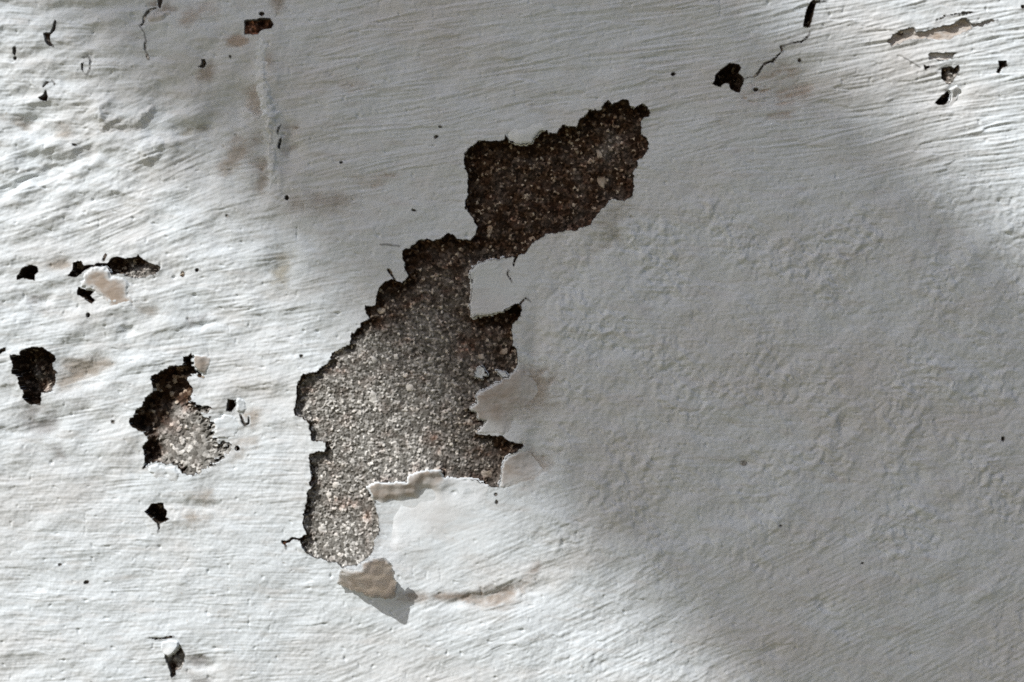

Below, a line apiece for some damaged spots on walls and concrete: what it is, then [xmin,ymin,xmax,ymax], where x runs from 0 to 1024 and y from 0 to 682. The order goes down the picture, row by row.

spalling [245,13,273,34]
crack [742,1,820,80]
peeling [887,12,994,46]
spalling [713,66,742,92]
spalling [924,53,961,106]
spalling [73,253,160,278]
spalling [80,289,95,317]
spalling [282,101,649,600]
spalling [0,348,56,403]
spalling [133,354,250,481]
spalling [148,503,168,529]
spalling [153,636,185,676]